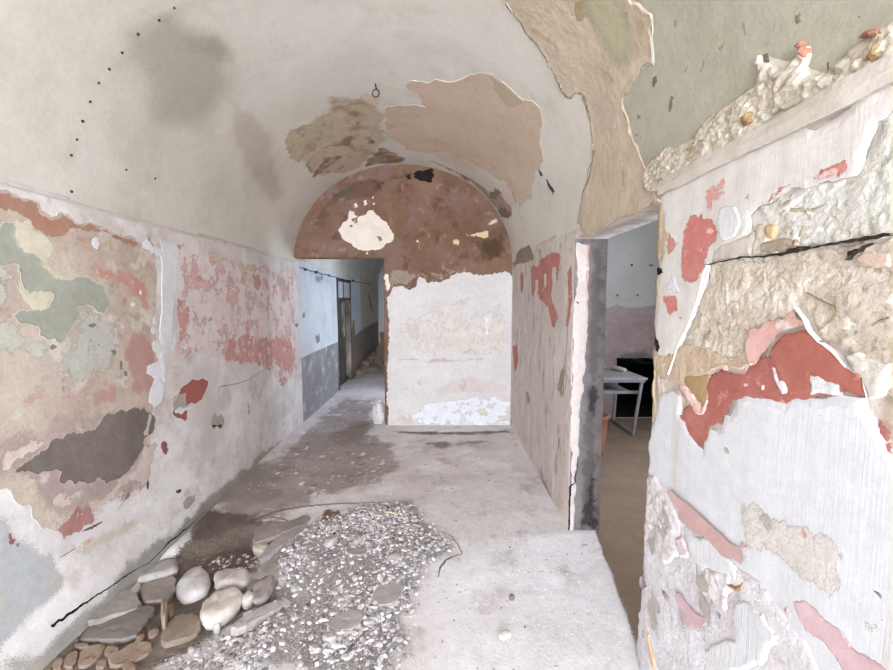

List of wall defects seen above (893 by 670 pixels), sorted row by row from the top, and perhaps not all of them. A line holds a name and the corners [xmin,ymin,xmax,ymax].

flaking render [383,72,555,208]
peeling [0,189,169,540]
peeling [171,242,305,386]
flaking render [505,0,893,448]
crack [706,233,891,265]
peeling [878,419,893,454]
crack [51,513,203,627]
flaking render [639,481,887,670]